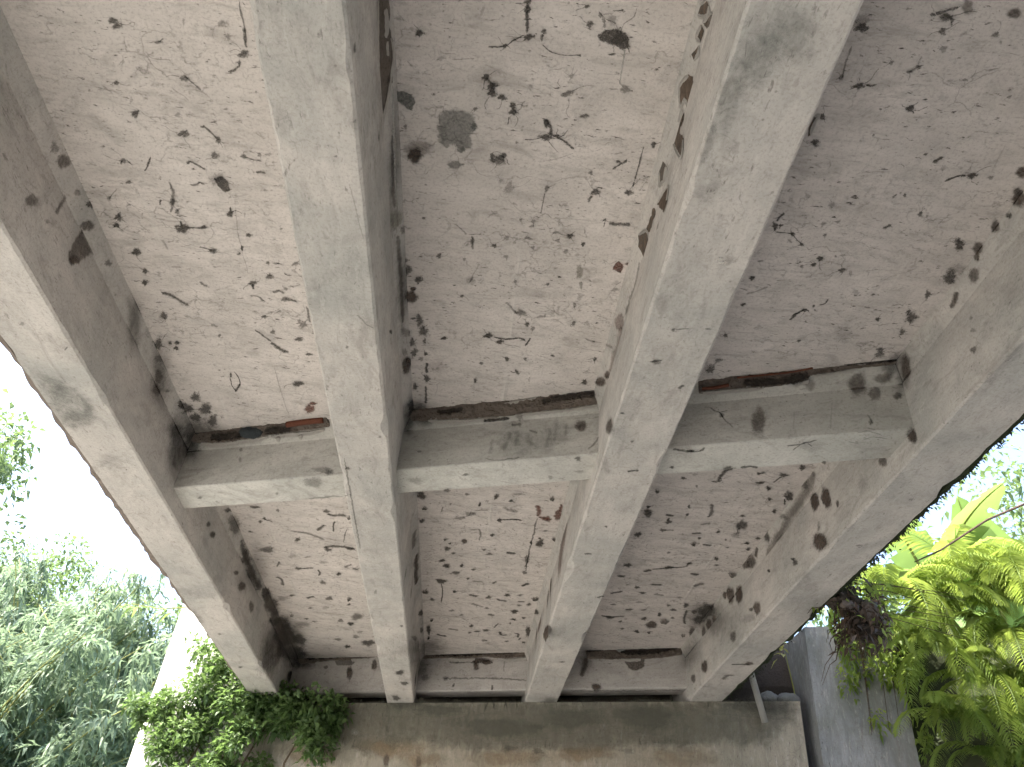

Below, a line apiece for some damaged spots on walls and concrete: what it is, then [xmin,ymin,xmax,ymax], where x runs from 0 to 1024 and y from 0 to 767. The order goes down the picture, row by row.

damp [578,5,630,56]
peeling [691,0,713,61]
peeling [673,74,693,160]
peeling [638,162,669,256]
spalling [698,359,897,396]
spalling [191,417,330,448]
spalling [410,390,598,425]
spalling [586,648,682,662]